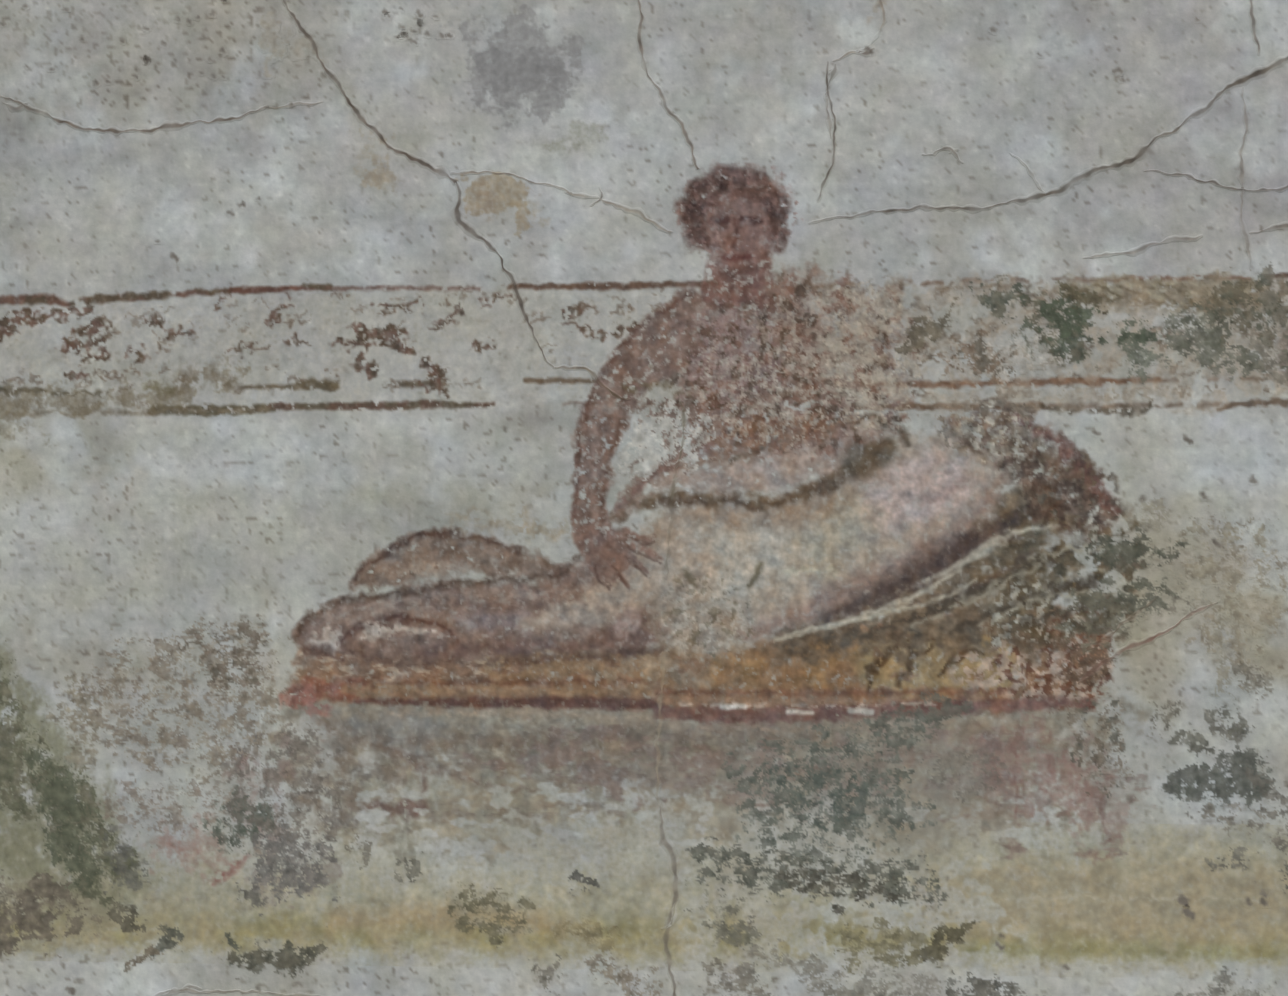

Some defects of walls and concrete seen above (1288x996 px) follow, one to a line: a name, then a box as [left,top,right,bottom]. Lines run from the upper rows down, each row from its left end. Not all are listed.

crack [0,0,673,401]
damp [437,0,613,173]
crack [635,0,701,170]
crack [808,0,1288,270]
crack [663,393,689,585]
damp [3,850,179,960]
crack [154,983,323,996]
crack [653,639,682,996]